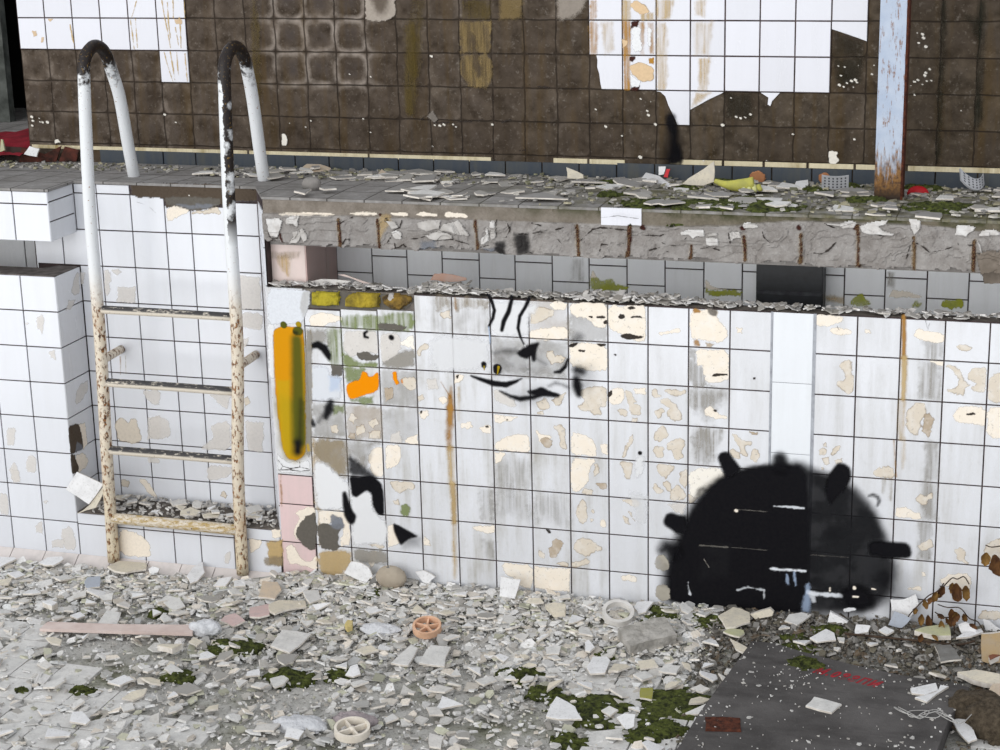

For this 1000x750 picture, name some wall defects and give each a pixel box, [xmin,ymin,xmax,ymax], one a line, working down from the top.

corrosion [161,0,187,81]
spalling [131,182,223,211]
flaking render [266,212,335,243]
flaking render [350,212,496,245]
flaking render [681,222,758,246]
flaking render [827,220,894,236]
flaking render [955,225,1000,253]
peeling [530,301,585,352]
spalling [68,424,83,474]
corrosion [446,393,456,524]
peeling [461,414,608,527]
peeling [608,388,724,503]